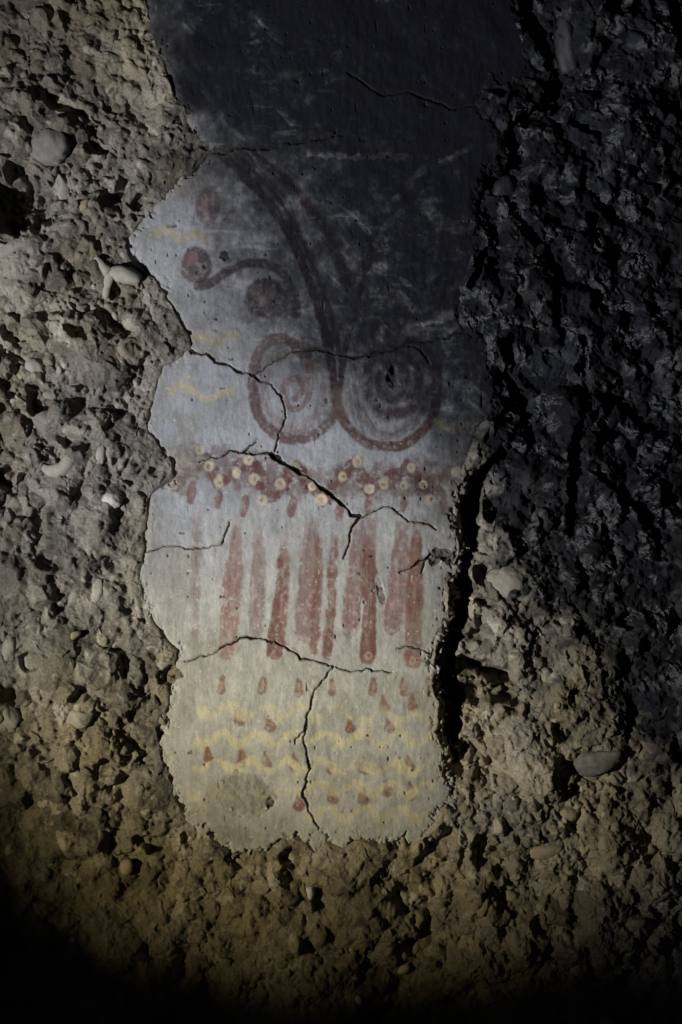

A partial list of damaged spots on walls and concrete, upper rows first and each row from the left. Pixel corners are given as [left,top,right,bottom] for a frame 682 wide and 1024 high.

spalling [387,366,397,387]
crack [191,331,465,559]
crack [146,527,229,553]
crack [401,551,457,574]
spalling [428,547,456,566]
spalling [167,665,184,684]
crack [187,636,391,827]